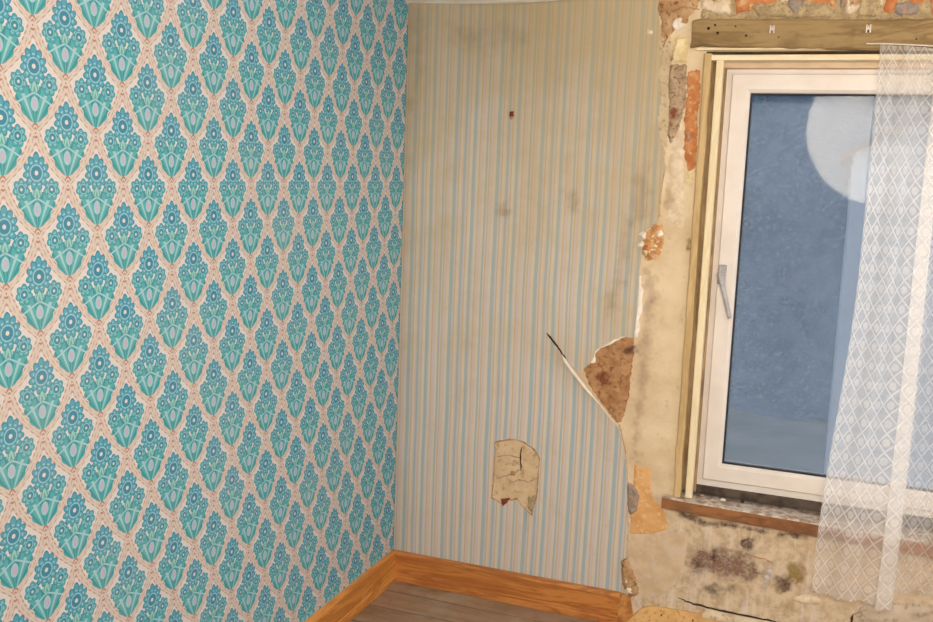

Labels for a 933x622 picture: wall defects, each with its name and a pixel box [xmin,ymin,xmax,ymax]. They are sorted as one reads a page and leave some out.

flaking render [637,0,933,261]
flaking render [584,337,634,423]
spalling [491,439,540,516]
flaking render [621,465,689,597]
water stain [693,528,764,580]
water stain [777,565,803,592]